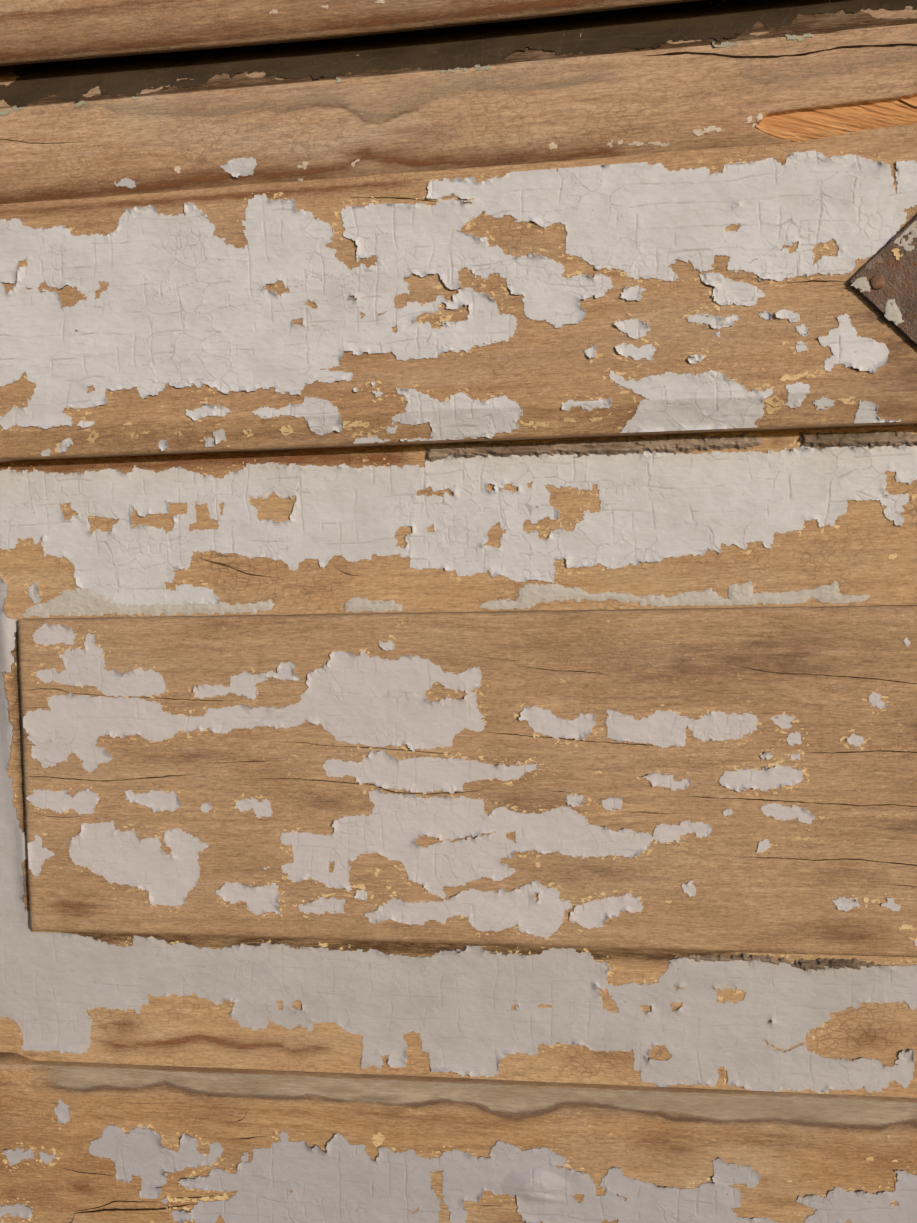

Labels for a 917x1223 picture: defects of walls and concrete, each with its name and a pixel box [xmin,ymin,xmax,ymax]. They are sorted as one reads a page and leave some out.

crack [646,43,917,58]
peeling [607,139,669,147]
peeling [693,126,723,136]
peeling [0,150,917,1096]
peeling [48,1099,70,1130]
peeling [1,1142,60,1172]
peeling [88,1124,777,1223]
peeling [796,1160,917,1223]
peeling [0,1198,33,1223]